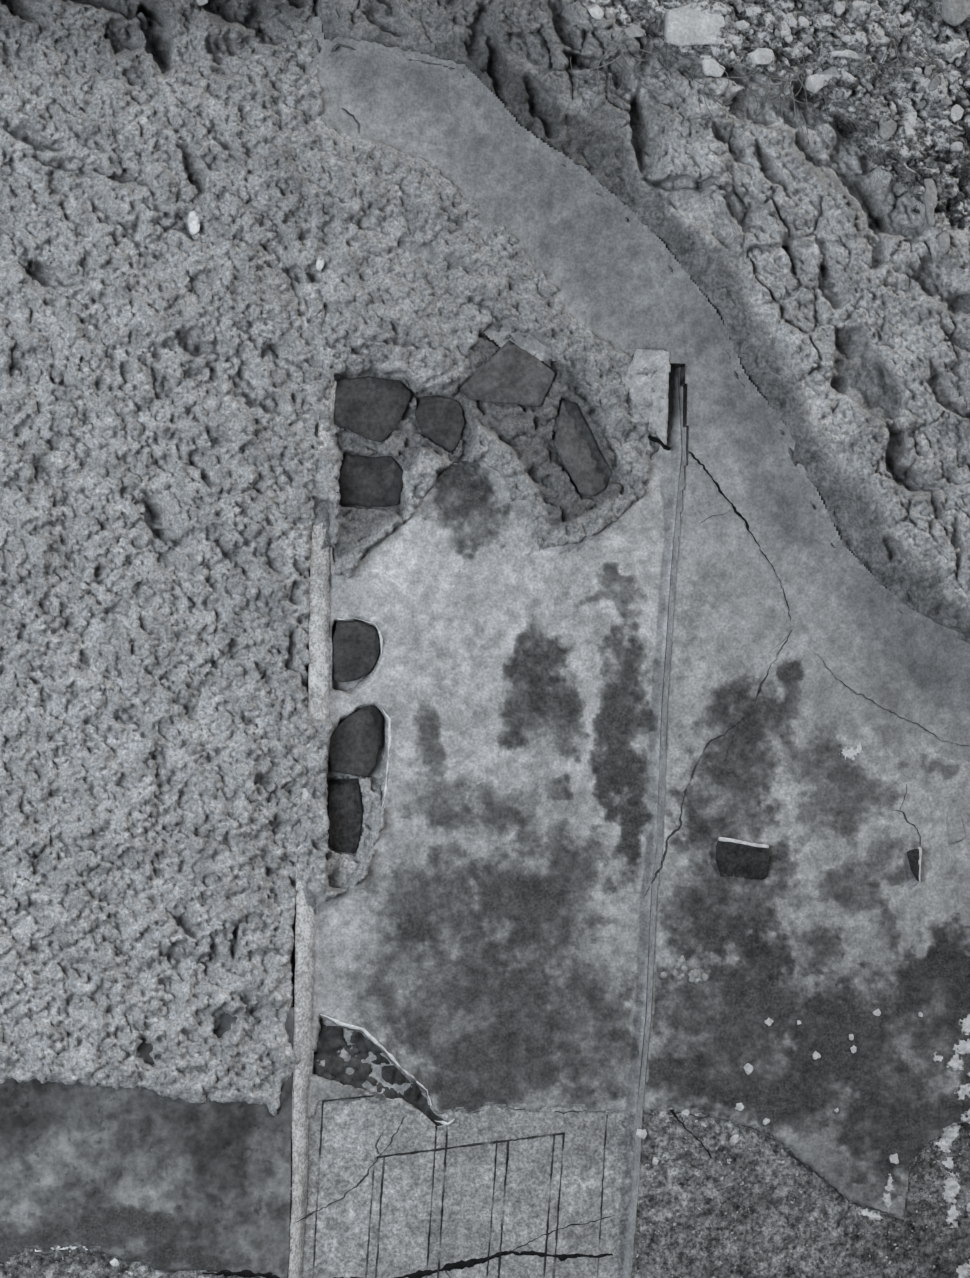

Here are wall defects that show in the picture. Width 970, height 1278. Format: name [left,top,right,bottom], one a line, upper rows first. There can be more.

spalling [313,0,970,644]
spalling [0,0,660,1126]
leakage [416,712,445,764]
leakage [429,786,538,854]
leakage [366,828,637,1111]
leakage [498,597,654,873]
spalling [660,954,709,984]
crack [645,434,793,895]
leakage [646,661,970,1228]
crack [203,1269,280,1278]
crack [394,1215,615,1278]
crack [670,1110,713,1159]